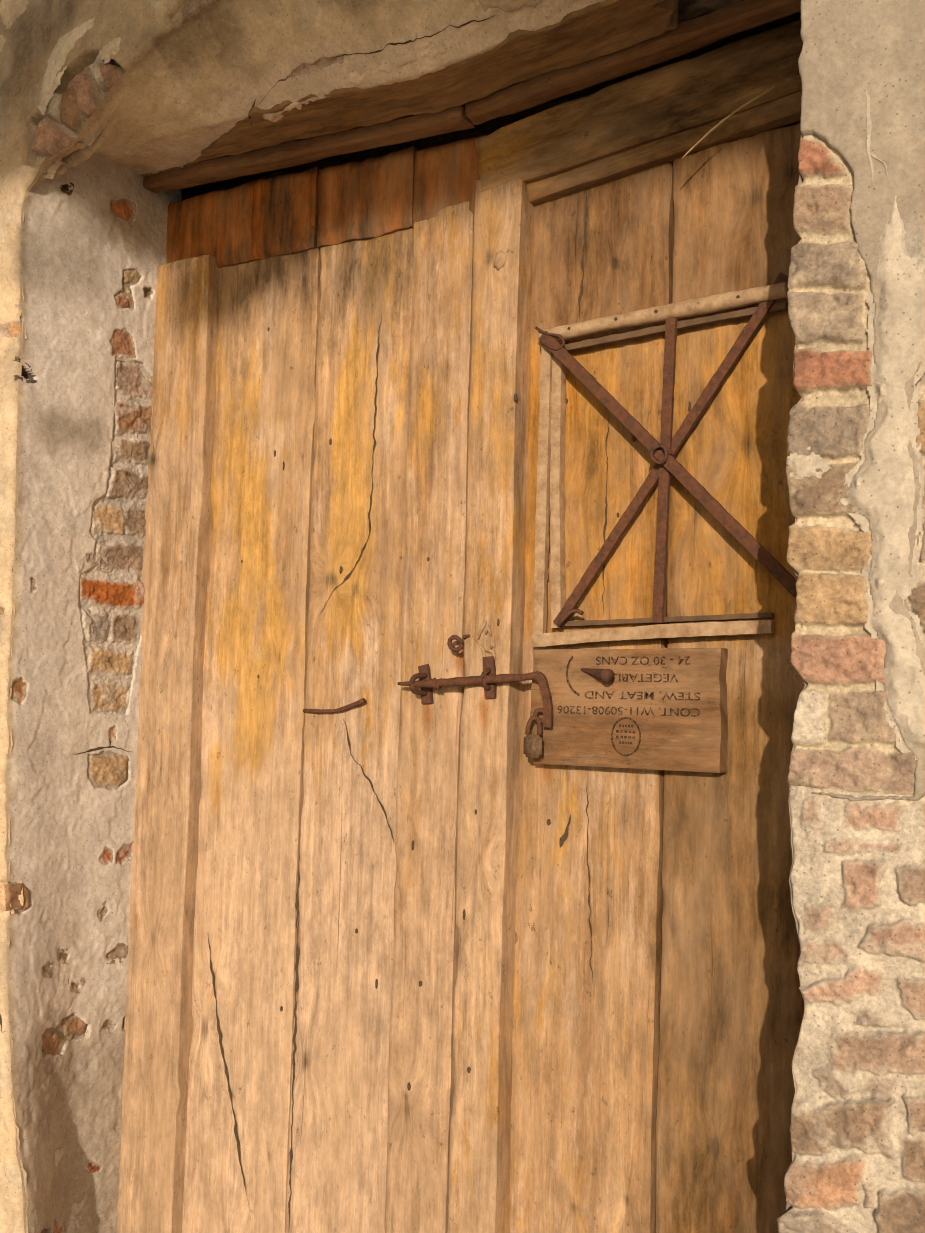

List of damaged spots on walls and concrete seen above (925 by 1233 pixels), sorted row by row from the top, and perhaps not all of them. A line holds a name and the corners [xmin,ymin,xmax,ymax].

crack [316,13,507,63]
spalling [32,16,126,179]
crack [248,76,290,125]
spalling [0,304,24,343]
peeling [74,329,153,790]
spalling [7,677,27,705]
spalling [777,134,925,1233]
flaking render [0,875,30,914]
spalling [41,947,85,994]
spalling [106,942,128,965]
spalling [42,1014,125,1055]